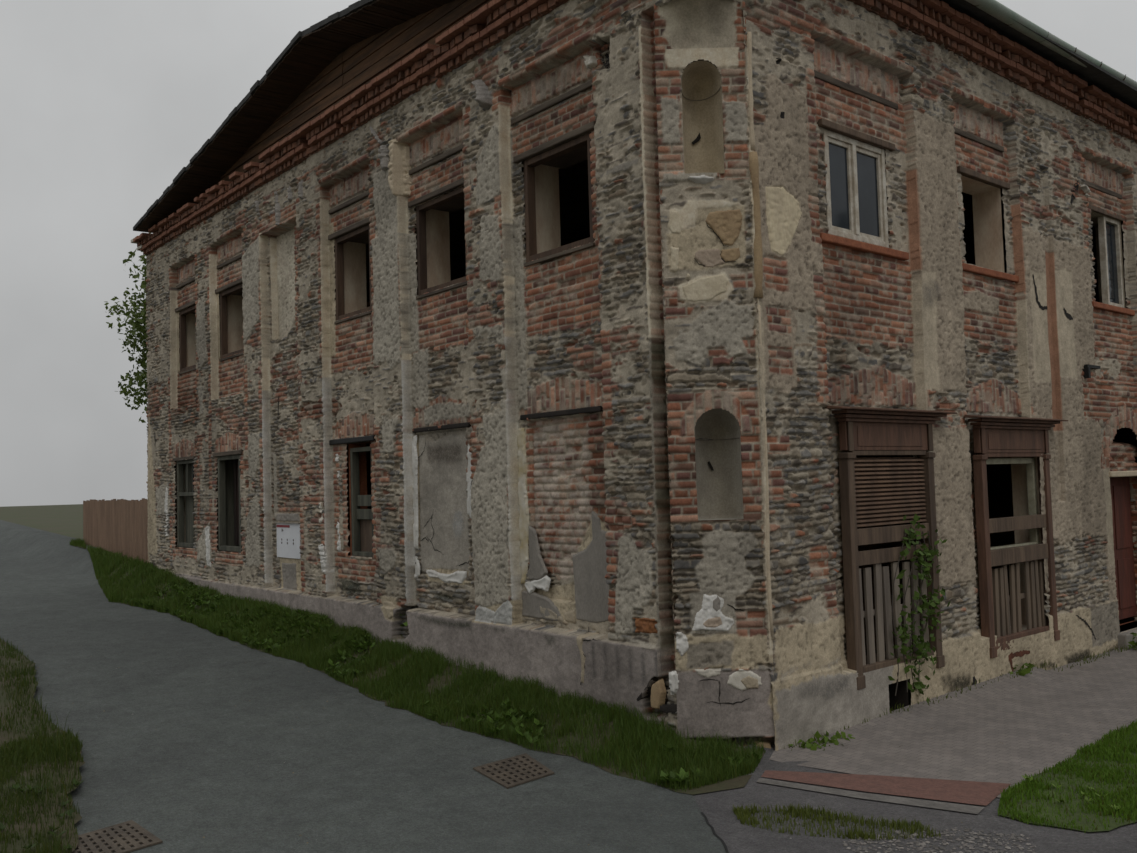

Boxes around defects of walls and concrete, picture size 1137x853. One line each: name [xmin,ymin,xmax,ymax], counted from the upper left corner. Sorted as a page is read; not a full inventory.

peeling [412,435,473,584]
peeling [676,594,734,656]
peeling [660,671,679,713]
peeling [695,668,762,691]